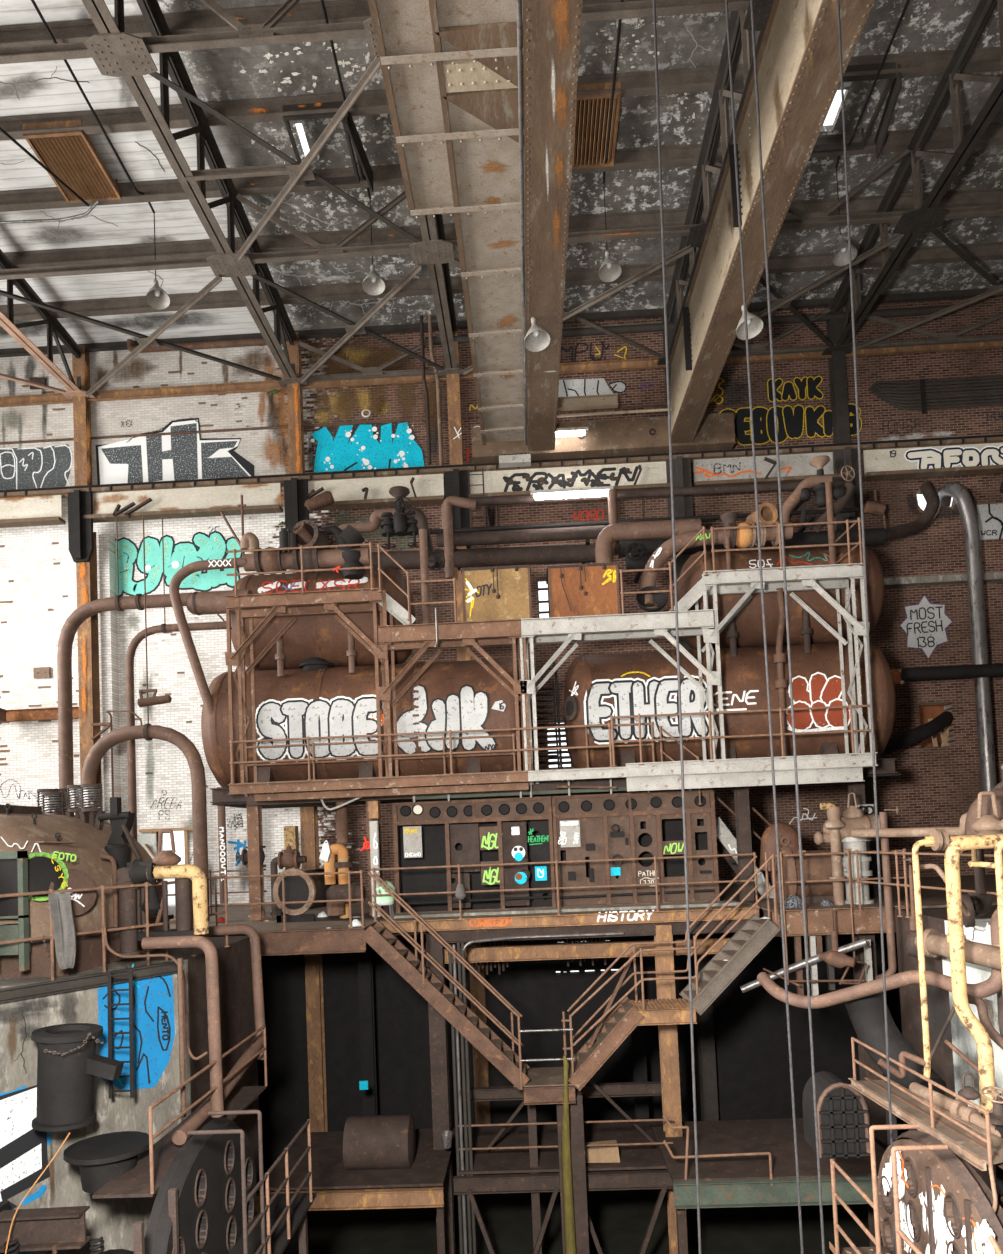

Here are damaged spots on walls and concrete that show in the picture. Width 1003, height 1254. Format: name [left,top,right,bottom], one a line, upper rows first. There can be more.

peeling [240,42,380,93]
rust [554,0,568,43]
peeling [589,20,665,70]
peeling [356,114,397,153]